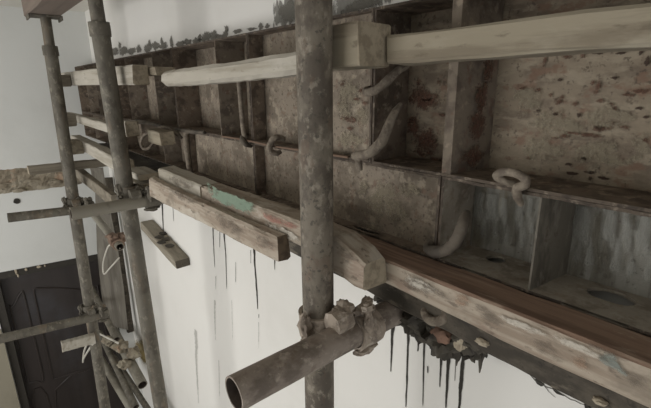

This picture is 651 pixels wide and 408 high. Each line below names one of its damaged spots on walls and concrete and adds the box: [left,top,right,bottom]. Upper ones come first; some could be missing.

rust [551,122,628,139]
spalling [453,339,467,352]
damp [439,357,465,408]